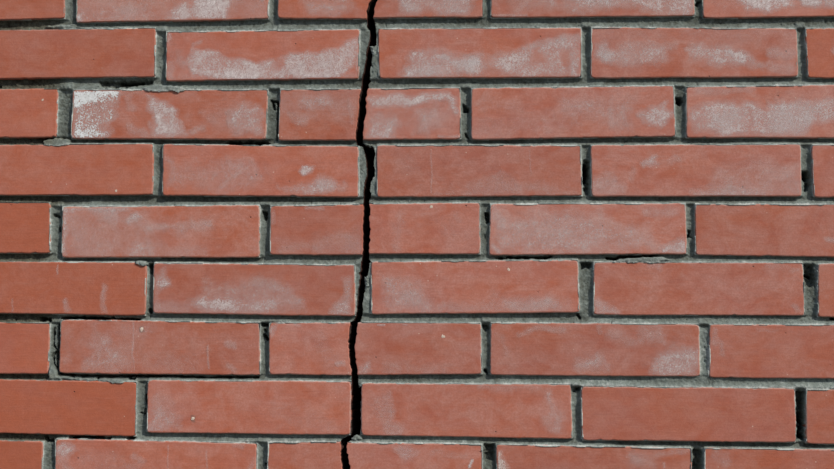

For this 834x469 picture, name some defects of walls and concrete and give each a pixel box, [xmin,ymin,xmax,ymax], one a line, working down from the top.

damp [743,0,790,11]
damp [190,42,357,79]
damp [74,91,119,138]
damp [149,99,180,135]
crack [341,0,377,469]